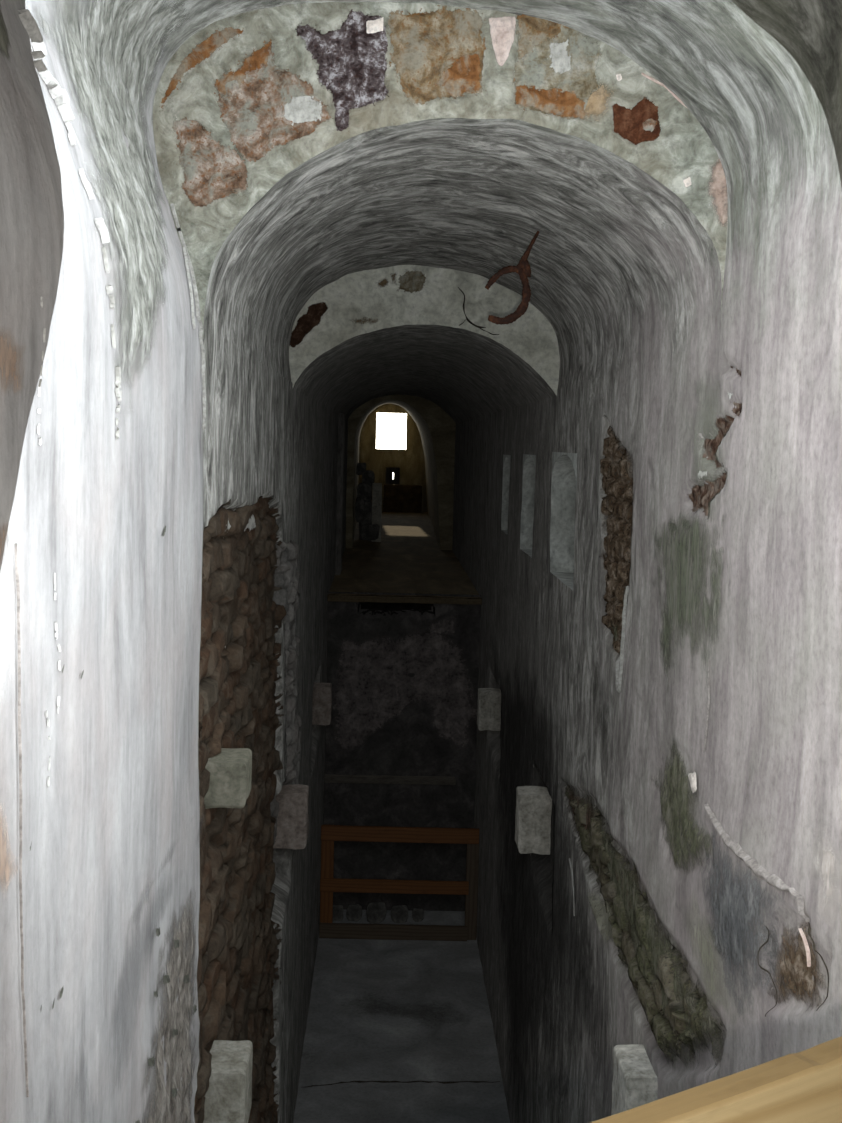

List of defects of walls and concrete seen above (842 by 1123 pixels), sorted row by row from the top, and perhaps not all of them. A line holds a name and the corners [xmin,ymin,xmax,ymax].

flaking render [0,5,11,58]
spalling [159,27,244,109]
spalling [172,5,488,207]
corrosion [584,85,661,145]
flaking render [18,0,206,440]
spalling [290,302,328,347]
spalling [396,270,426,293]
spalling [668,391,742,532]
spalling [600,426,633,693]
spalling [135,496,302,1123]
spalling [757,922,829,1017]